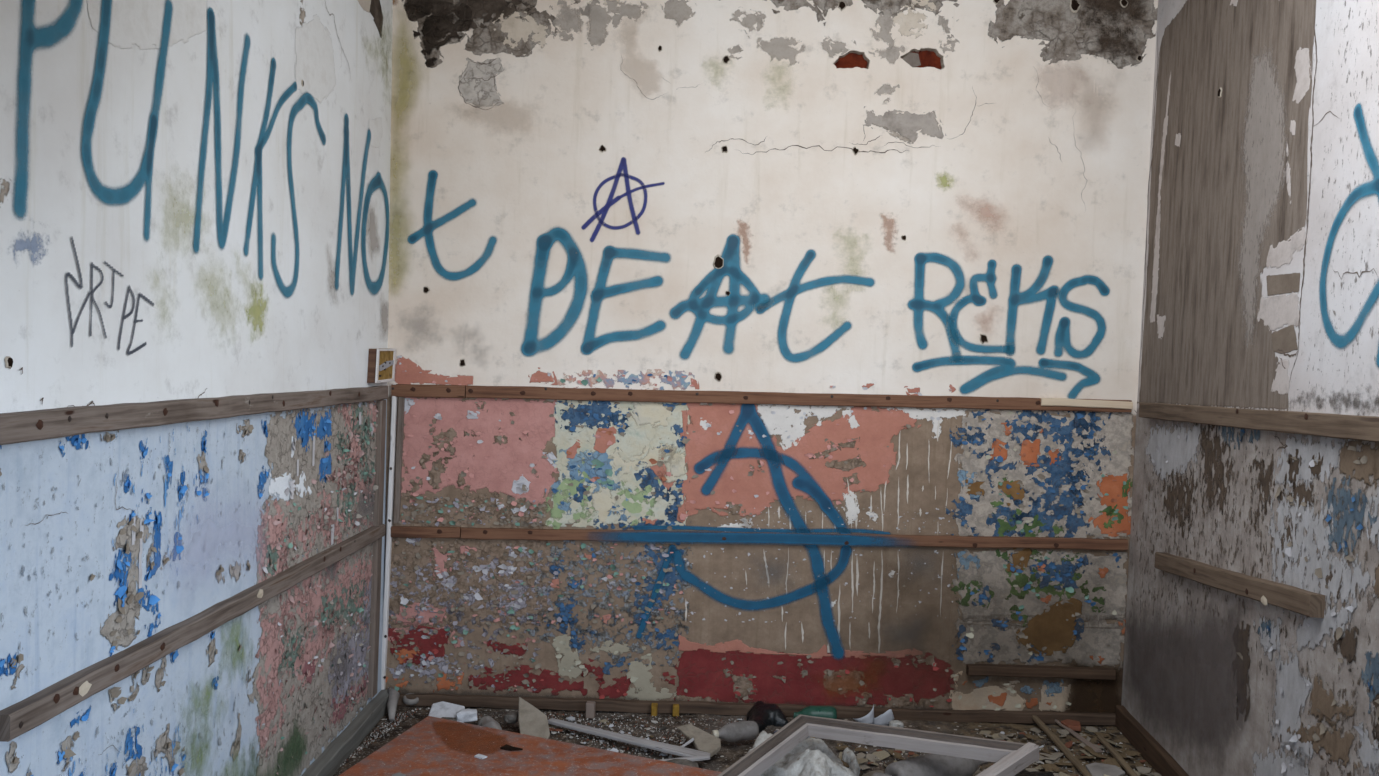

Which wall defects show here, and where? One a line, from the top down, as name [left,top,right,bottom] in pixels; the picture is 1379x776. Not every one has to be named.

flaking render [295,0,336,103]
leakage [1080,0,1143,58]
crack [709,87,993,155]
crack [1277,0,1377,390]
peeling [384,0,1379,776]
leakage [1298,393,1379,415]
peeling [0,401,378,690]
peeling [57,543,372,776]
peeling [6,741,34,776]